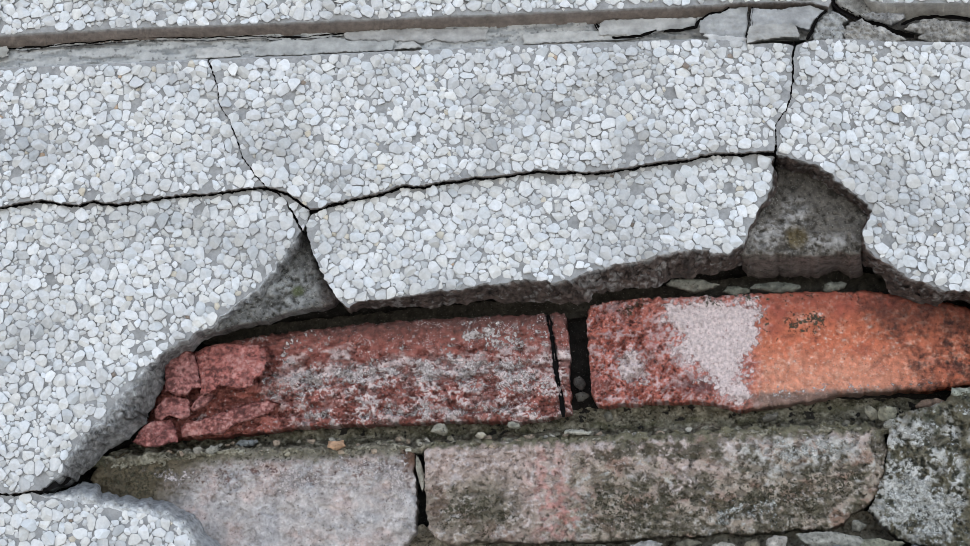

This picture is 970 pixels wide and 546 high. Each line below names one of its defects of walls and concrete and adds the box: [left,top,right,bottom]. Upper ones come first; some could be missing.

crack [0,0,970,241]
spalling [341,155,970,314]
crack [0,477,71,497]
spalling [39,232,304,546]